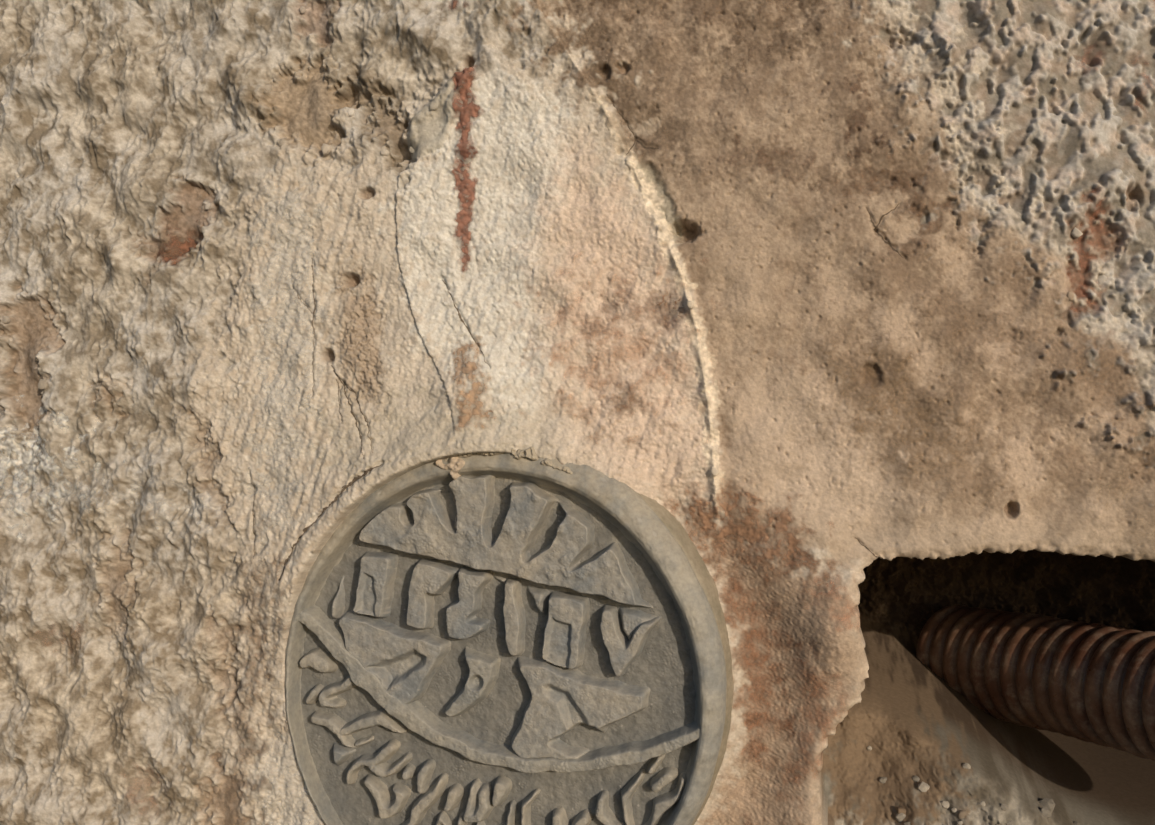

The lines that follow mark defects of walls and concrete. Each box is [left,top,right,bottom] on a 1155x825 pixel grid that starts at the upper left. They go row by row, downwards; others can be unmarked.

corrosion [452,67,480,272]
crack [606,94,659,155]
spalling [822,549,1155,825]